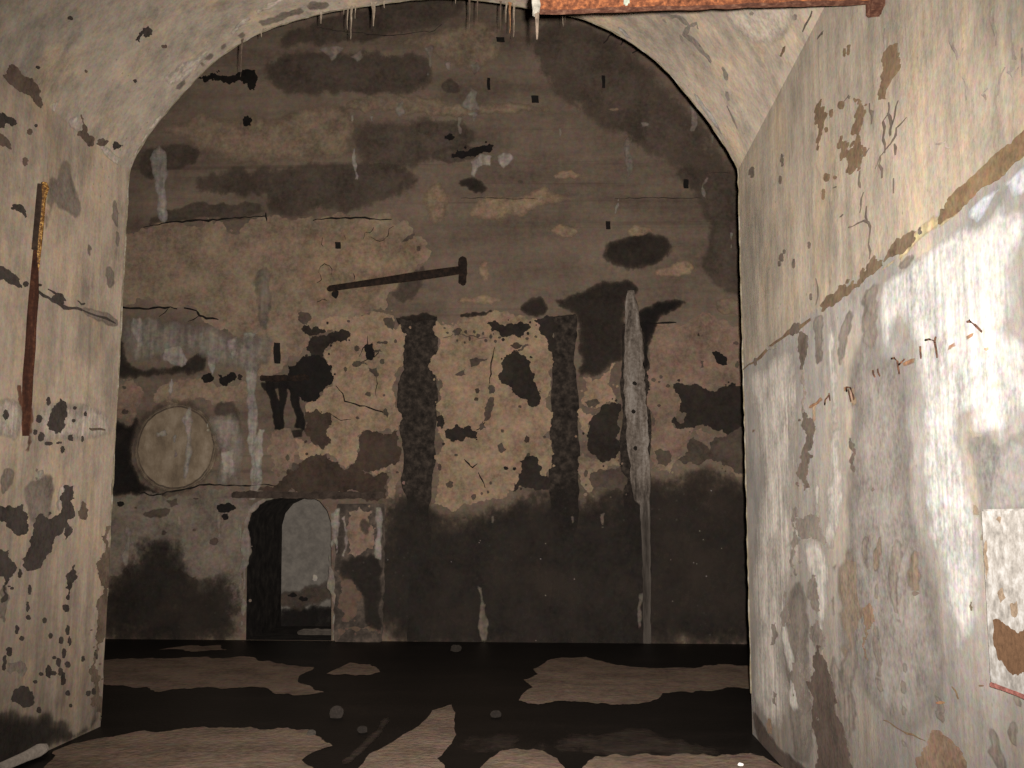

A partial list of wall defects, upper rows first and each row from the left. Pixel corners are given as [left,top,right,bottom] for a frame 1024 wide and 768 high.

corrosion [17,182,49,450]
crack [39,289,218,324]
crack [145,212,267,227]
leakage [134,0,564,225]
leakage [521,22,741,376]
spalling [814,43,901,200]
spalling [809,227,922,312]
crack [833,95,907,259]
spalling [938,130,1024,225]
leakage [40,267,306,640]
leakage [281,167,1024,768]
peeling [0,485,252,721]